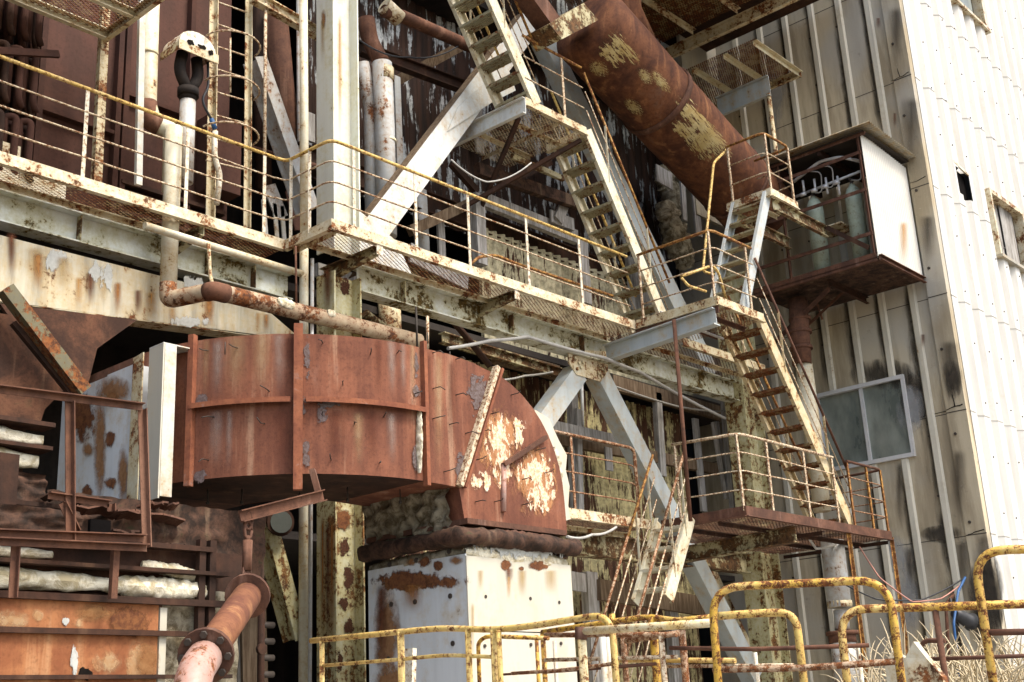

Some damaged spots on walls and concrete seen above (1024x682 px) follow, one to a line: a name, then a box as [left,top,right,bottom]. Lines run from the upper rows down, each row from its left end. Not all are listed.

peeling [590,33,670,92]
peeling [672,98,731,160]
peeling [46,249,67,272]
rust [78,274,120,301]
damp [815,311,827,373]
damp [844,285,938,492]
damp [946,344,961,394]
rust [40,377,185,534]
peeling [471,413,557,516]
rust [501,560,552,584]
rust [79,605,157,681]
rust [372,556,468,682]